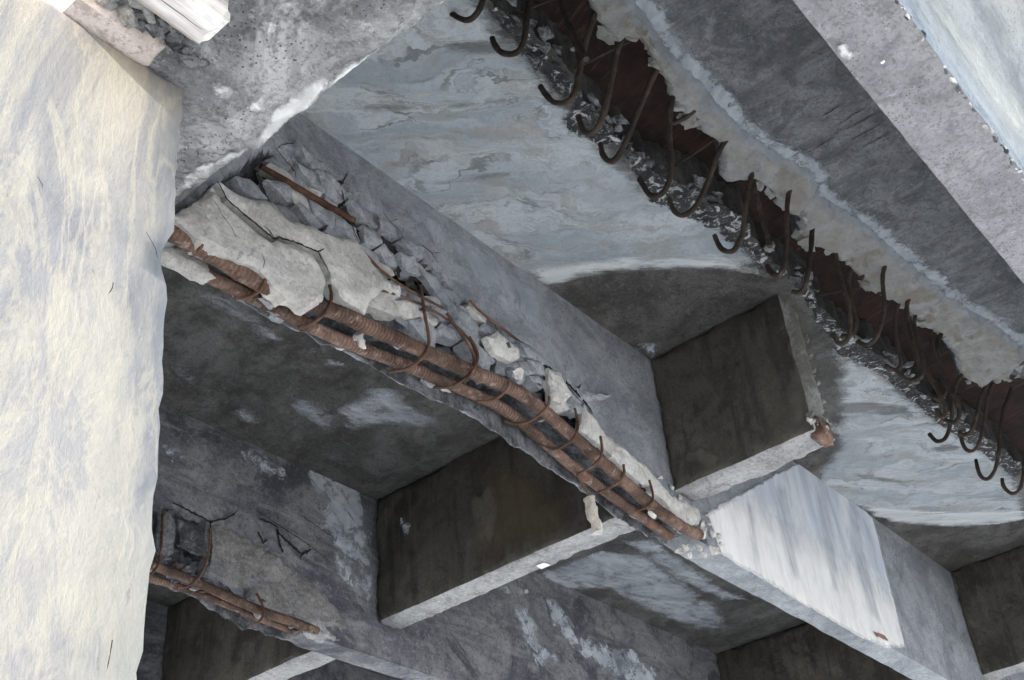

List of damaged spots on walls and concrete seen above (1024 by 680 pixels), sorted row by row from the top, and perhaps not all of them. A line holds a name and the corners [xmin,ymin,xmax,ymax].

spalling [449,0,486,23]
crack [214,143,331,282]
spalling [489,0,728,218]
spalling [712,172,820,296]
spalling [937,54,976,112]
spalling [982,125,1024,181]
spalling [161,133,723,559]
leakage [259,0,1024,647]
spalling [804,333,835,446]
spalling [830,253,1024,495]
spalling [149,509,350,643]
crack [173,502,336,572]